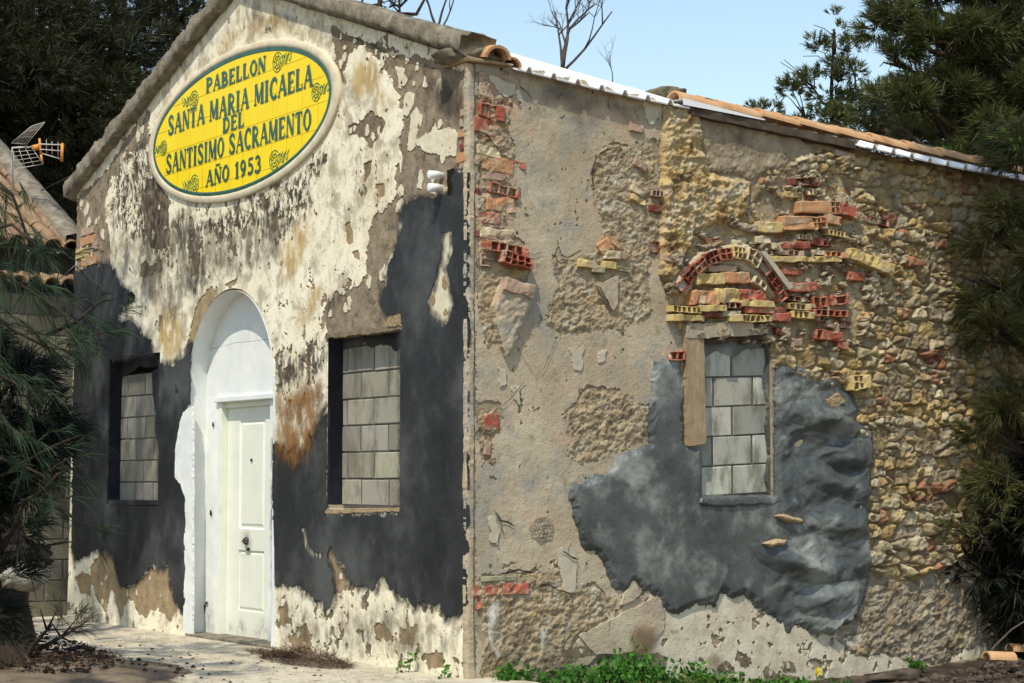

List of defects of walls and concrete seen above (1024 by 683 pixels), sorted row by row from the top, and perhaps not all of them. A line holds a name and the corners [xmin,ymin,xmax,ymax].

spalling [75,112,151,270]
spalling [140,178,171,277]
damp [115,139,326,295]
spalling [322,29,536,346]
flaking render [542,101,896,352]
spalling [187,278,238,354]
damp [278,344,323,388]
spalling [561,387,649,465]
flaking render [826,374,872,407]
spalling [76,550,179,619]
spalling [473,547,617,682]
spalling [833,556,1024,665]